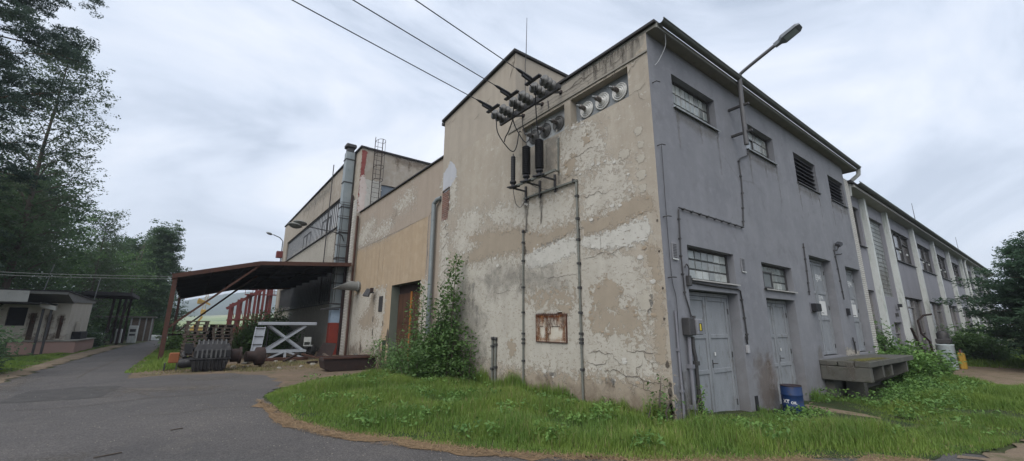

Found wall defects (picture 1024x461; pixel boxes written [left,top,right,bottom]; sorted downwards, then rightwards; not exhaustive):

peeling [357,113,683,419]
rust [536,313,566,341]
crack [591,350,665,392]